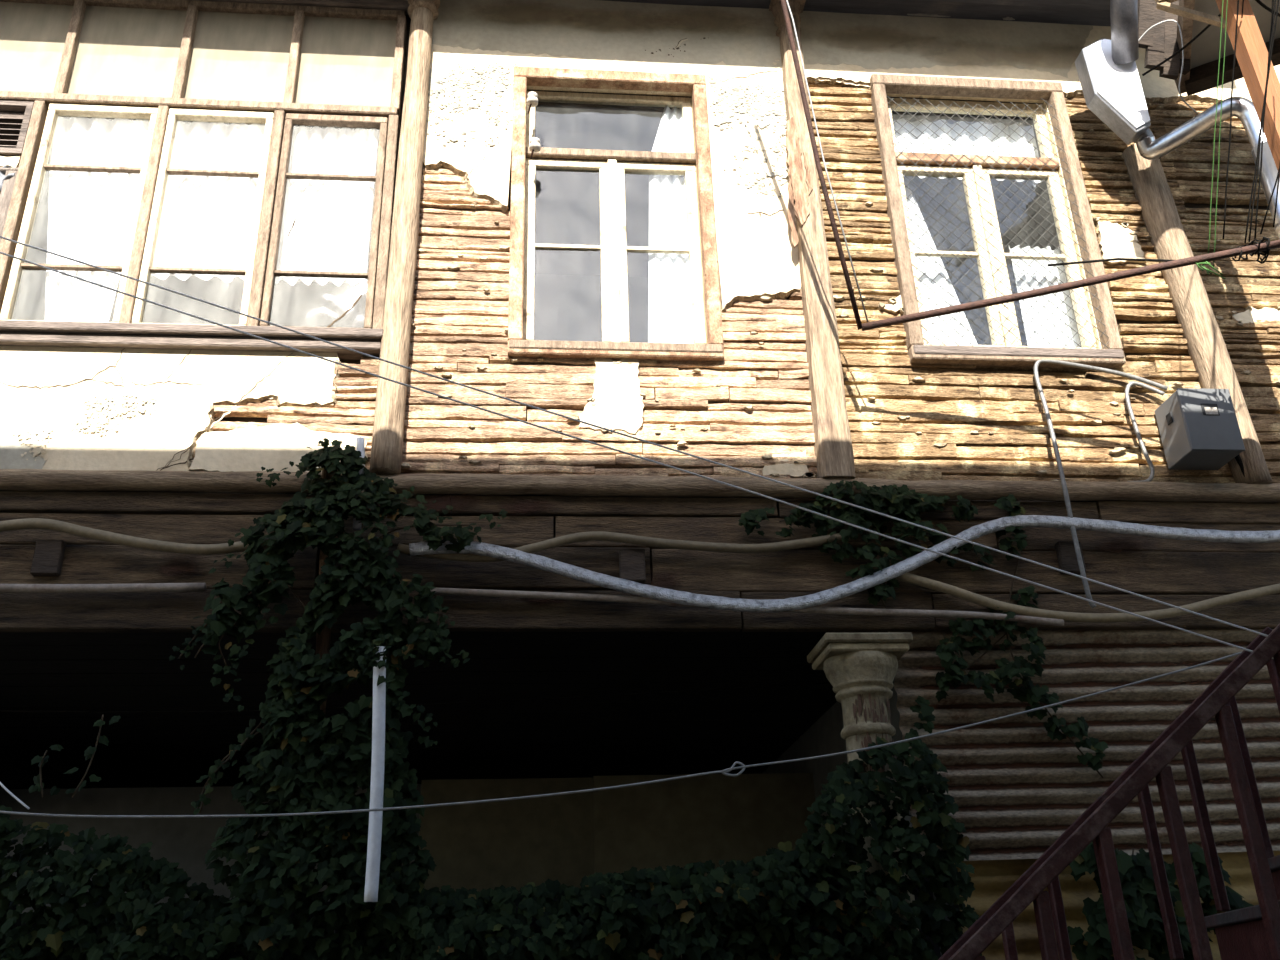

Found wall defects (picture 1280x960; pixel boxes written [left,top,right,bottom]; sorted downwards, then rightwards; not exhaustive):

spalling [401,62,817,478]
spalling [709,60,1235,483]
peeling [0,381,162,469]
crack [8,348,294,471]
spalling [187,357,379,472]